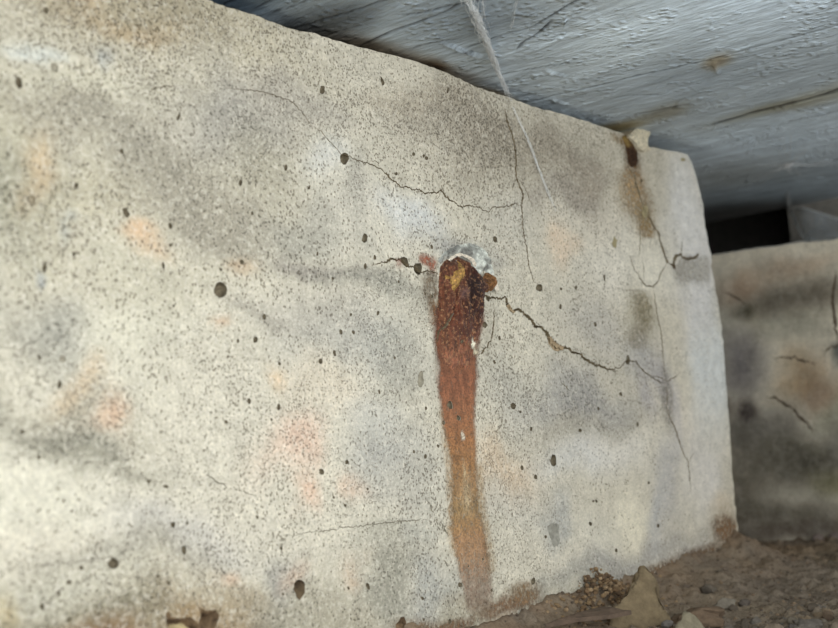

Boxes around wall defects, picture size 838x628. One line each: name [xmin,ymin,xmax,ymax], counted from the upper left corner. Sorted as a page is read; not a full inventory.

crack [228,88,537,284]
corrosion [419,256,497,602]
crack [478,168,699,491]
crack [768,396,814,433]
crack [772,270,838,364]
spalling [166,607,220,628]